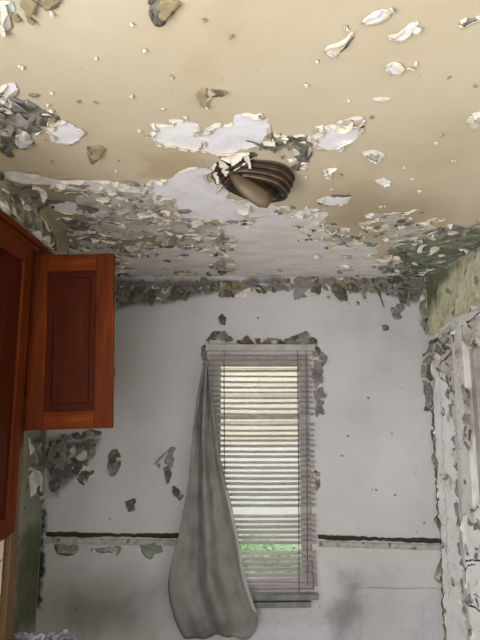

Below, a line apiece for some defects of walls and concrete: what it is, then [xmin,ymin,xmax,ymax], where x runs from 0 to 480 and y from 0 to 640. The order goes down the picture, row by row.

peeling [324,7,394,59]
peeling [388,22,422,42]
peeling [0,82,86,158]
peeling [0,112,428,320]
damp [115,279,218,307]
damp [394,230,480,309]
peeling [201,314,327,417]
peeling [358,209,480,640]
peeling [28,429,102,500]
peeling [107,449,121,477]
peeling [124,498,136,512]
peeling [154,447,184,501]